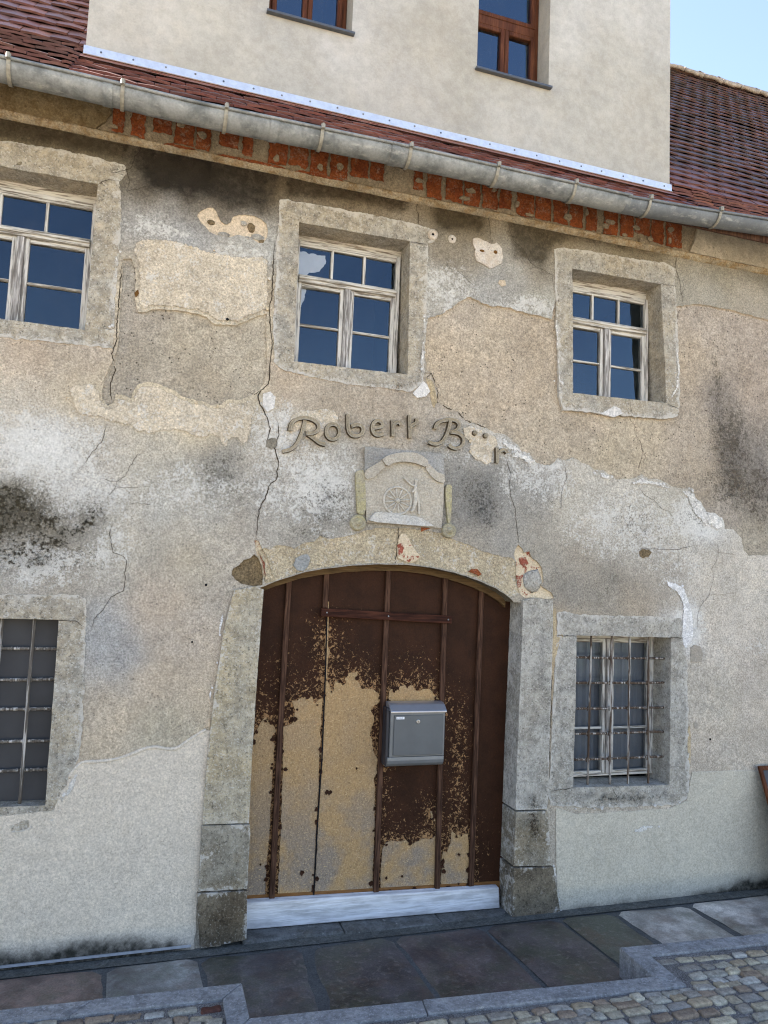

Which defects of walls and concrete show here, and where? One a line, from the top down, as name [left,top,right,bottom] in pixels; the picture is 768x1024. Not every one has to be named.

flaking render [108,108,385,182]
flaking render [413,171,682,249]
crack [105,268,122,405]
crack [84,430,150,505]
spalling [66,239,271,447]
crack [250,244,279,532]
spalling [420,297,768,556]
leakage [715,410,768,521]
leakage [0,481,102,568]
crack [92,524,127,626]
spalling [232,527,564,665]
leakage [0,941,182,971]